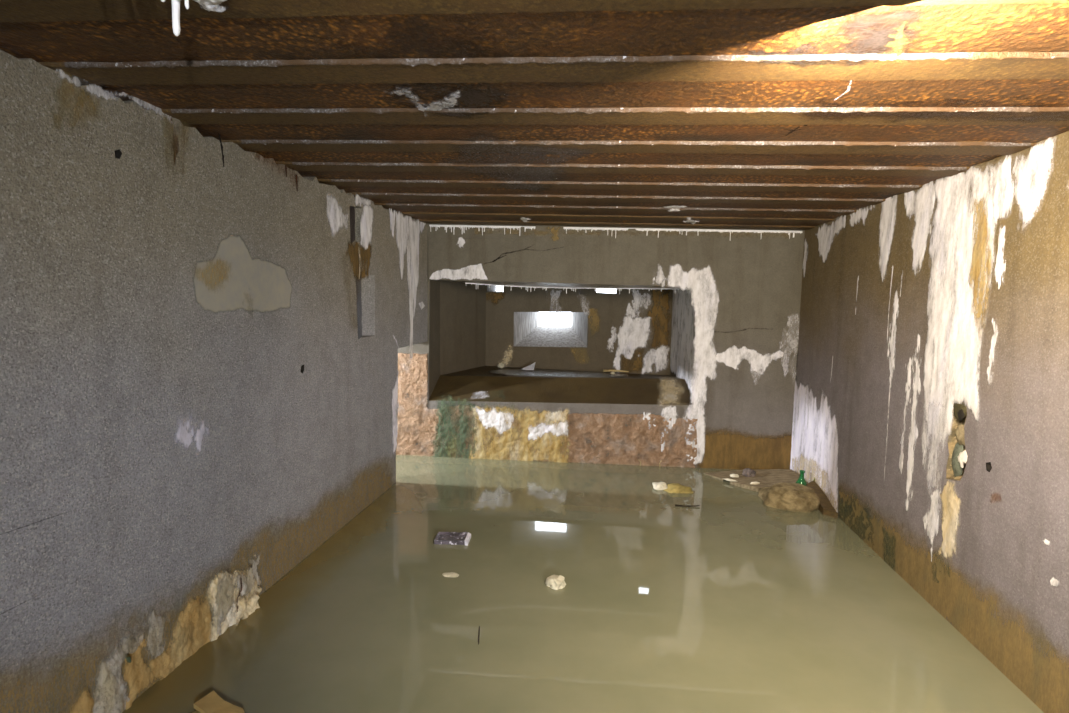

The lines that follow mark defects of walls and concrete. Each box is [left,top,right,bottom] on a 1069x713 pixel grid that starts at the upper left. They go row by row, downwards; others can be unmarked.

leakage [161,0,227,36]
leakage [56,11,1069,125]
flaking render [396,353,698,468]
leakage [241,135,1069,713]
spalling [946,401,968,481]